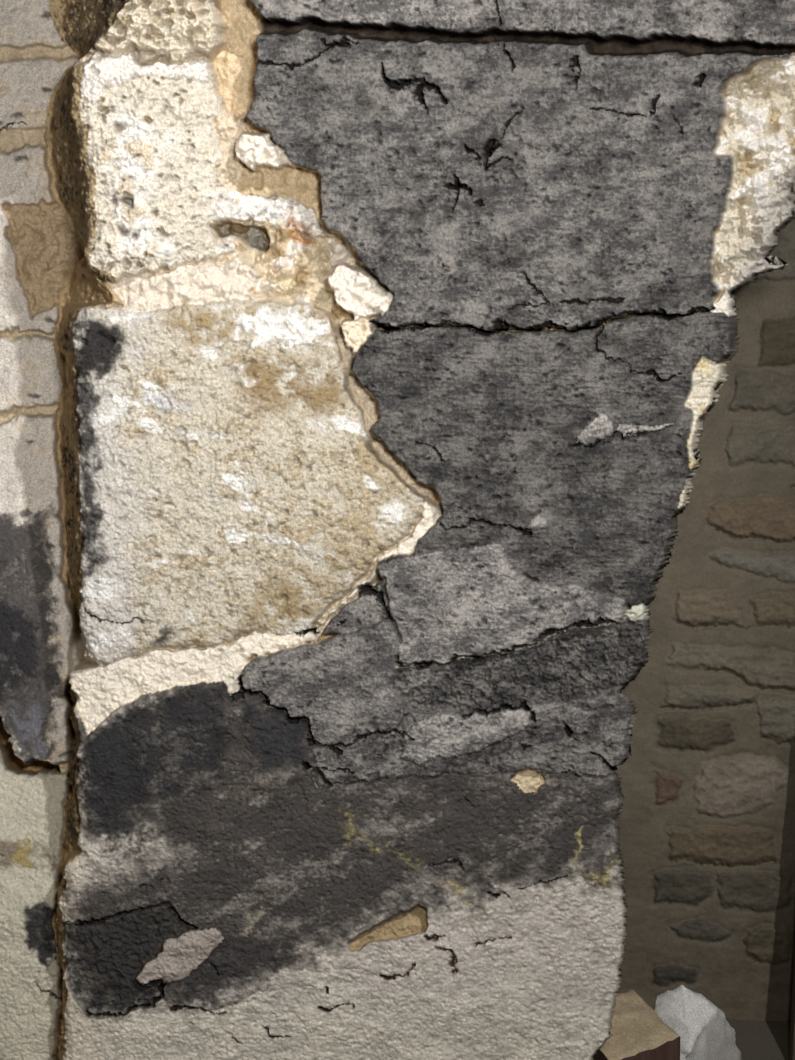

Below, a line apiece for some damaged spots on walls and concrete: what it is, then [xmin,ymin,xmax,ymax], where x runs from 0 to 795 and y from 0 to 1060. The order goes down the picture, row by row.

crack [496,1,516,73]
spalling [211,219,378,367]
crack [369,272,715,383]
crack [397,617,619,671]
damp [83,690,228,842]
damp [244,706,311,768]
crack [304,729,415,775]
crack [462,702,537,751]
crack [565,725,574,737]
damp [74,912,176,1009]
damp [176,905,296,1004]